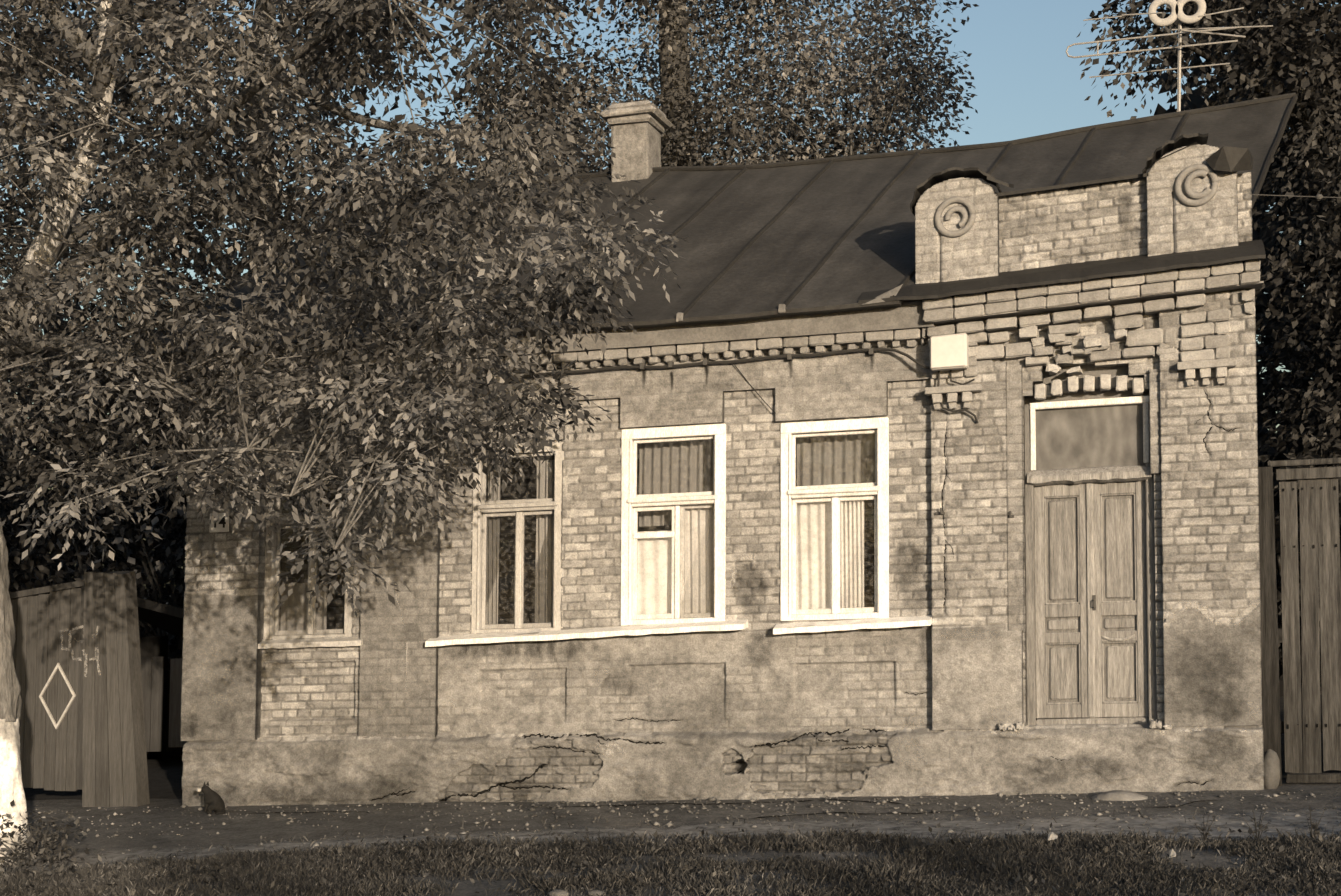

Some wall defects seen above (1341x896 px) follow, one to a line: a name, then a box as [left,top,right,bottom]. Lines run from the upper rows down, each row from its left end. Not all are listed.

crack [1196,389,1238,451]
spalling [436,739,603,802]
spalling [723,730,897,798]